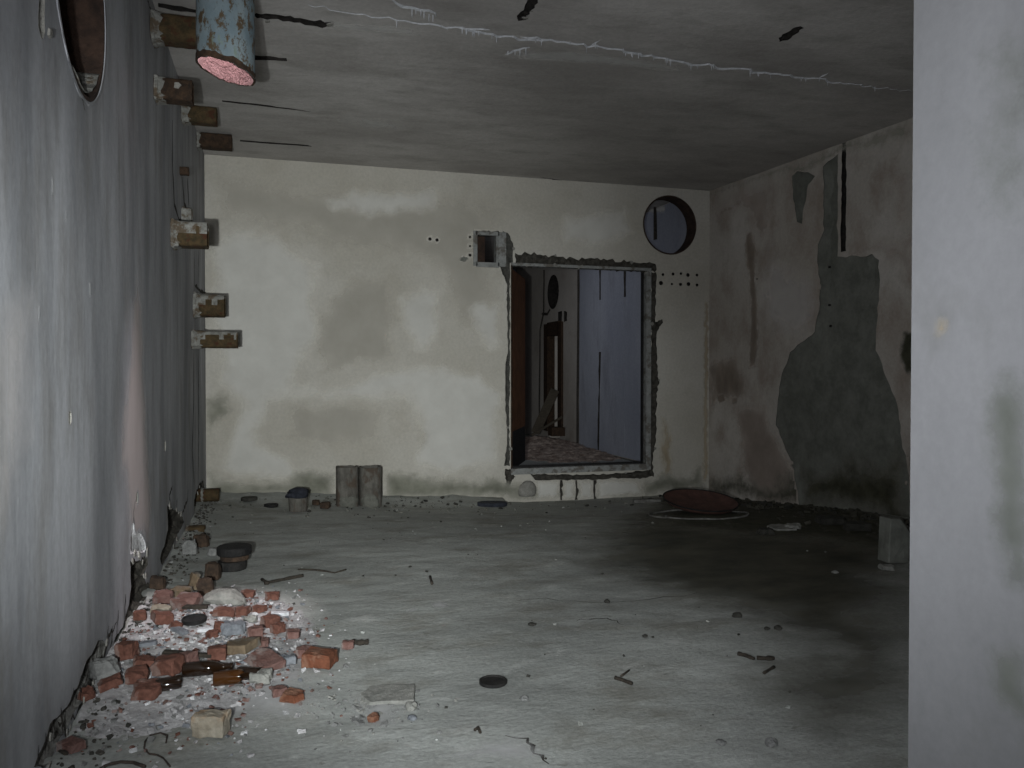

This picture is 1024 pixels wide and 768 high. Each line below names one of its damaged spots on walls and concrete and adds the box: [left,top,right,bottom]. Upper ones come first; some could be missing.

spalling [517,0,538,21]
crack [308,0,911,91]
spalling [779,26,803,42]
spalling [776,155,910,518]
crack [560,480,597,500]
crack [38,597,126,756]